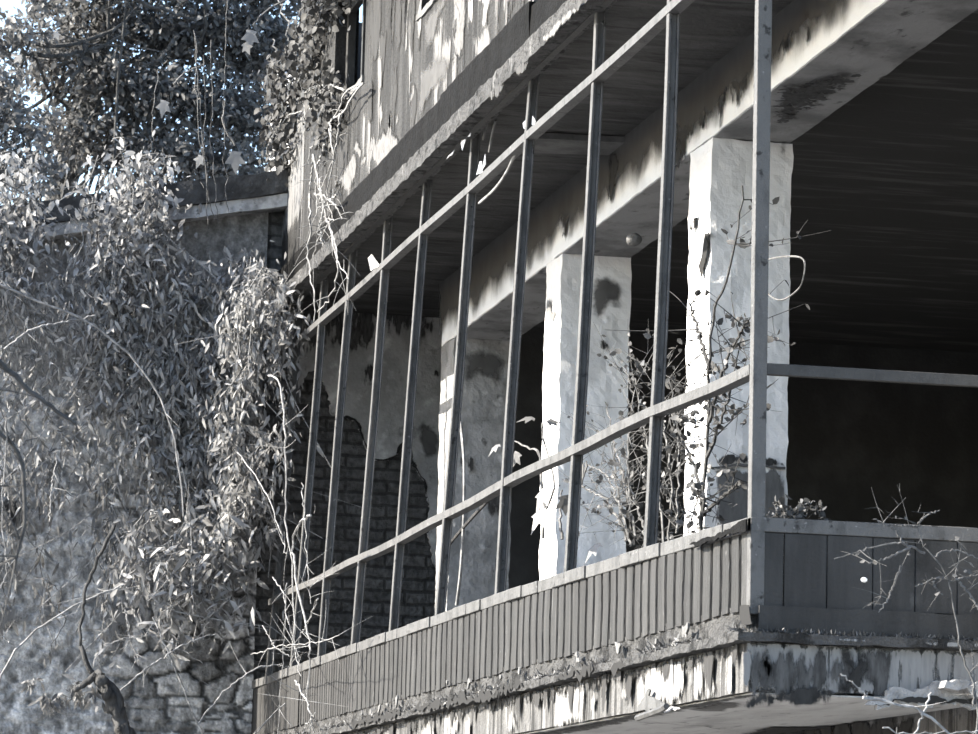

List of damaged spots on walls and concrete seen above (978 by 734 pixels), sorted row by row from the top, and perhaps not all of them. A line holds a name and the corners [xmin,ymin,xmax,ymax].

peeling [454,0,488,59]
damp [543,0,583,41]
damp [771,0,848,68]
peeling [335,111,399,192]
damp [281,0,524,247]
damp [597,104,664,208]
damp [675,32,755,169]
damp [302,166,587,351]
damp [593,278,620,316]
damp [420,424,438,456]
flaking render [287,415,434,631]
spalling [864,677,978,711]